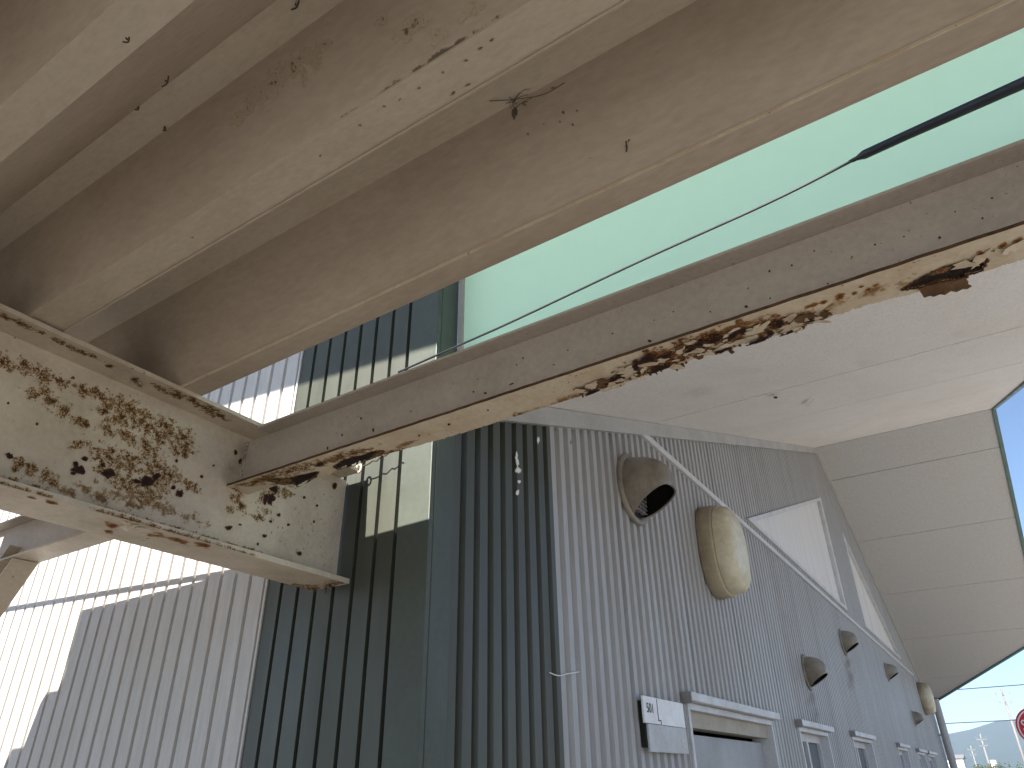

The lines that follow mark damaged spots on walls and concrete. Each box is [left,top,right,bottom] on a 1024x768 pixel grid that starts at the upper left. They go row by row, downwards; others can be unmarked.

peeling [951,239,1024,270]
corrosion [0,313,115,369]
corrosion [554,284,885,404]
corrosion [0,350,420,556]